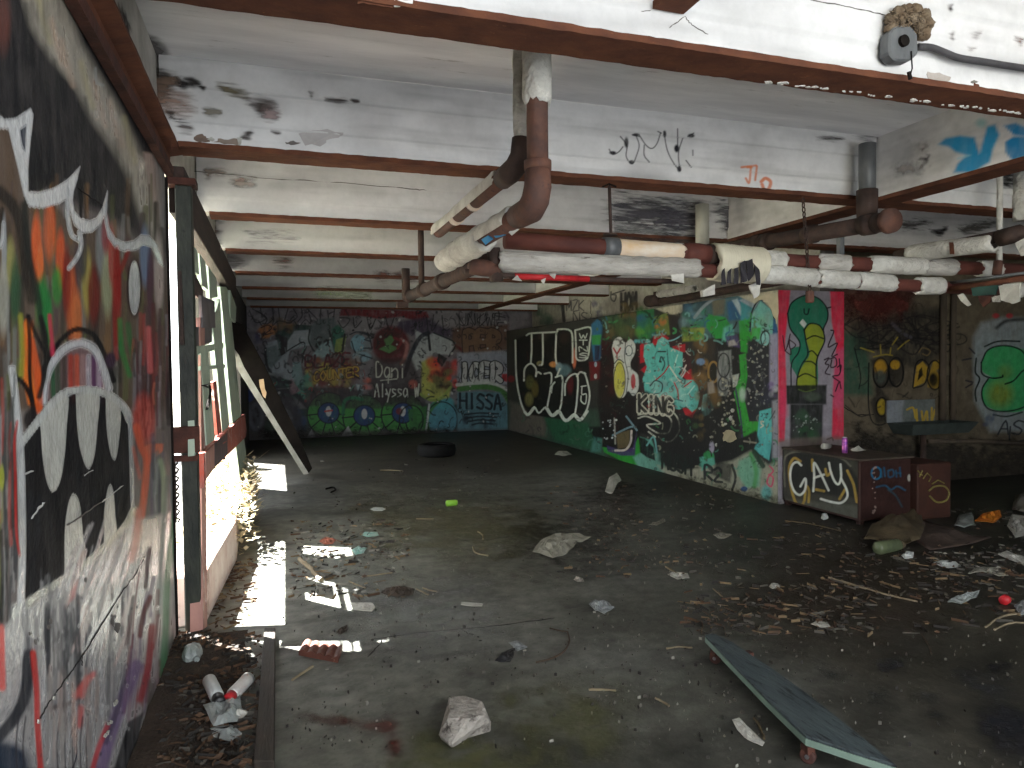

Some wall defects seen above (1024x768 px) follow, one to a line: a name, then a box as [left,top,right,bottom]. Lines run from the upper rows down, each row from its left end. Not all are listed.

peeling [765,81,829,90]
peeling [910,98,1021,115]
peeling [194,134,242,145]
spalling [285,129,343,146]